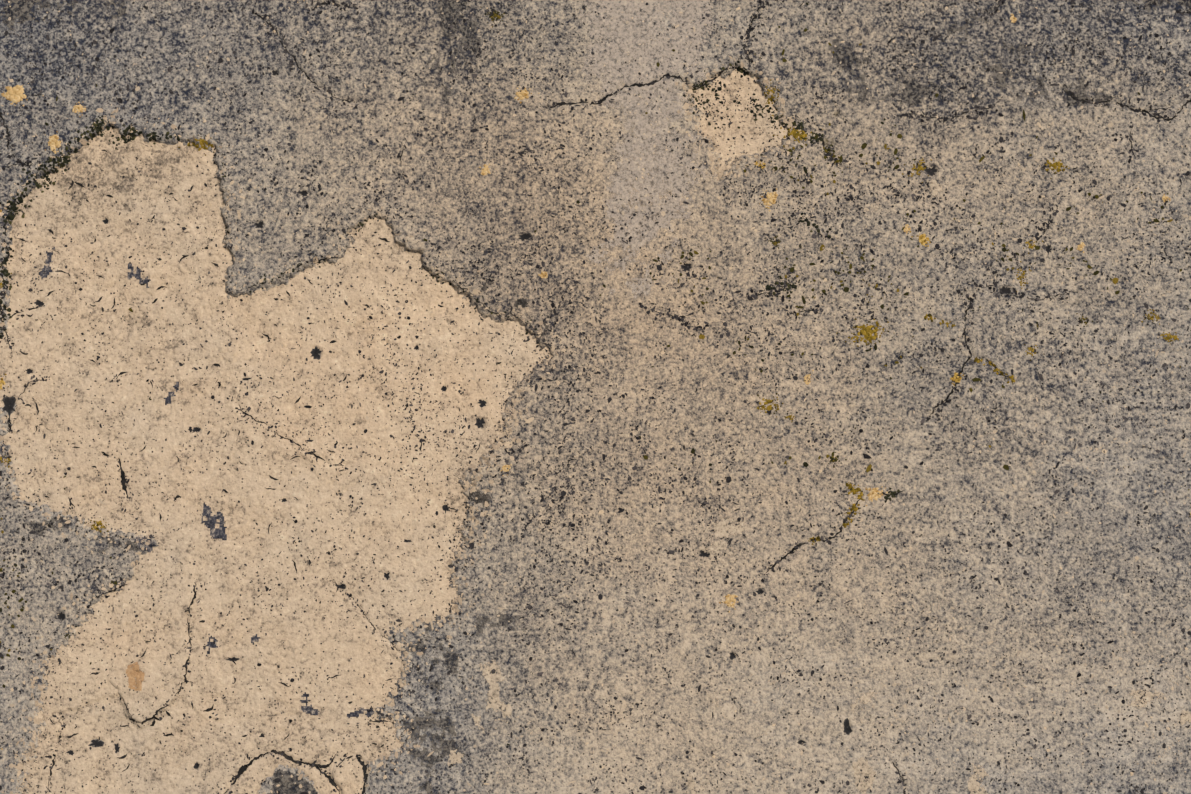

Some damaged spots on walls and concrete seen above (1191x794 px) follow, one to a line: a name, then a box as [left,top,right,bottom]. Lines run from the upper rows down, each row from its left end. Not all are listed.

crack [743,0,764,64]
crack [550,74,686,108]
spalling [675,51,805,181]
crack [744,267,818,314]
crack [930,285,1063,415]
spalling [0,107,566,794]
crack [766,490,904,573]